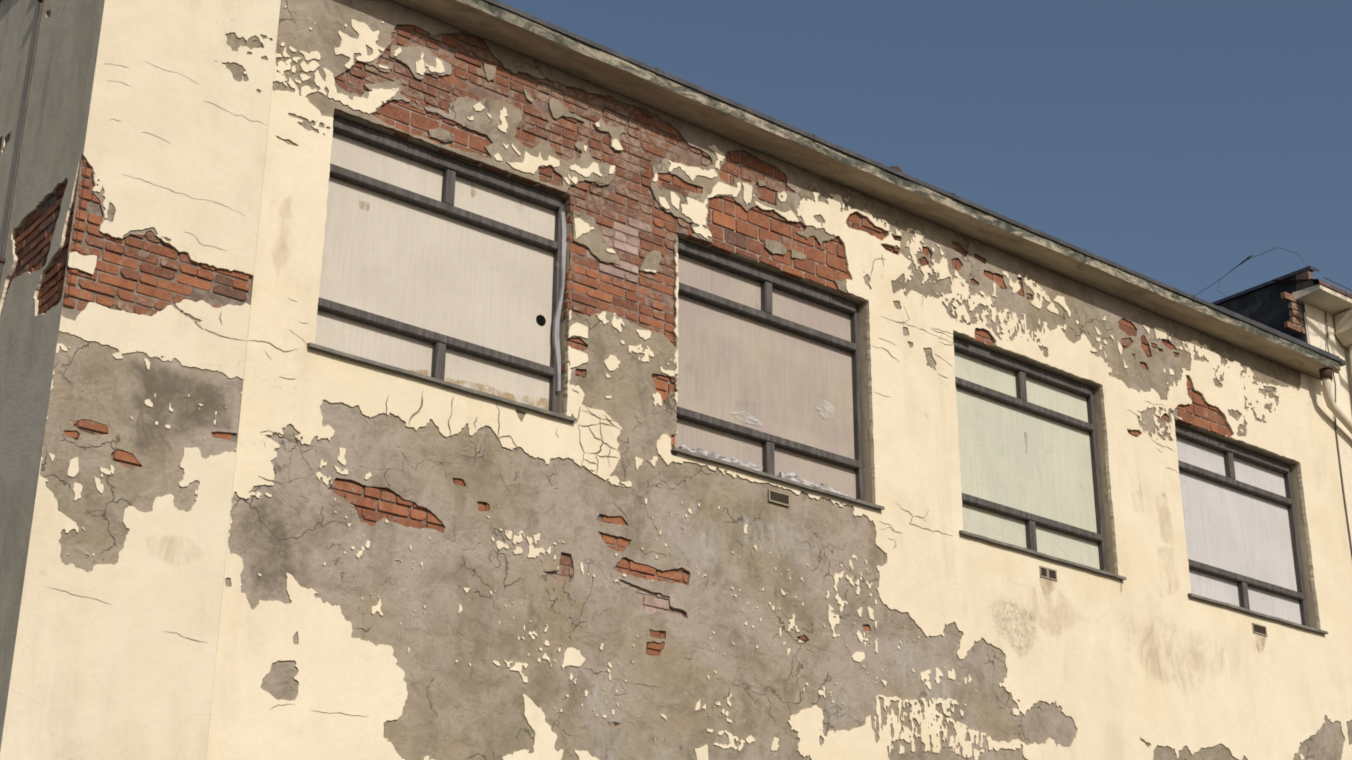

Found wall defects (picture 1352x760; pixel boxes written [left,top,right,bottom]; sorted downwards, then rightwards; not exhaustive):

crack [110,61,264,124]
crack [122,174,243,215]
flaking render [1281,292,1305,335]
flaking render [3,155,252,573]
flaking render [222,0,1301,760]
crack [556,388,618,474]
flaking render [1293,715,1352,760]